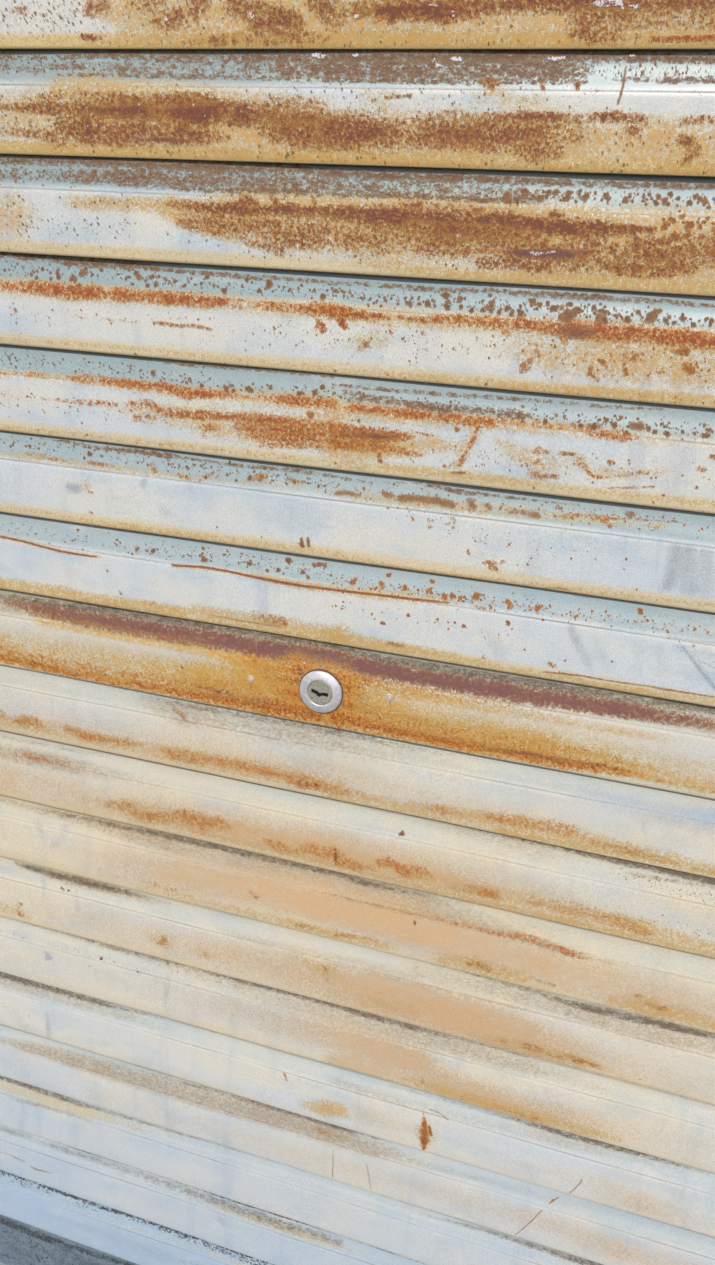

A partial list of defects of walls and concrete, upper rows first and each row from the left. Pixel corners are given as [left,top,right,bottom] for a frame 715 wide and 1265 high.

corrosion [0,0,715,792]
corrosion [417,1114,433,1150]